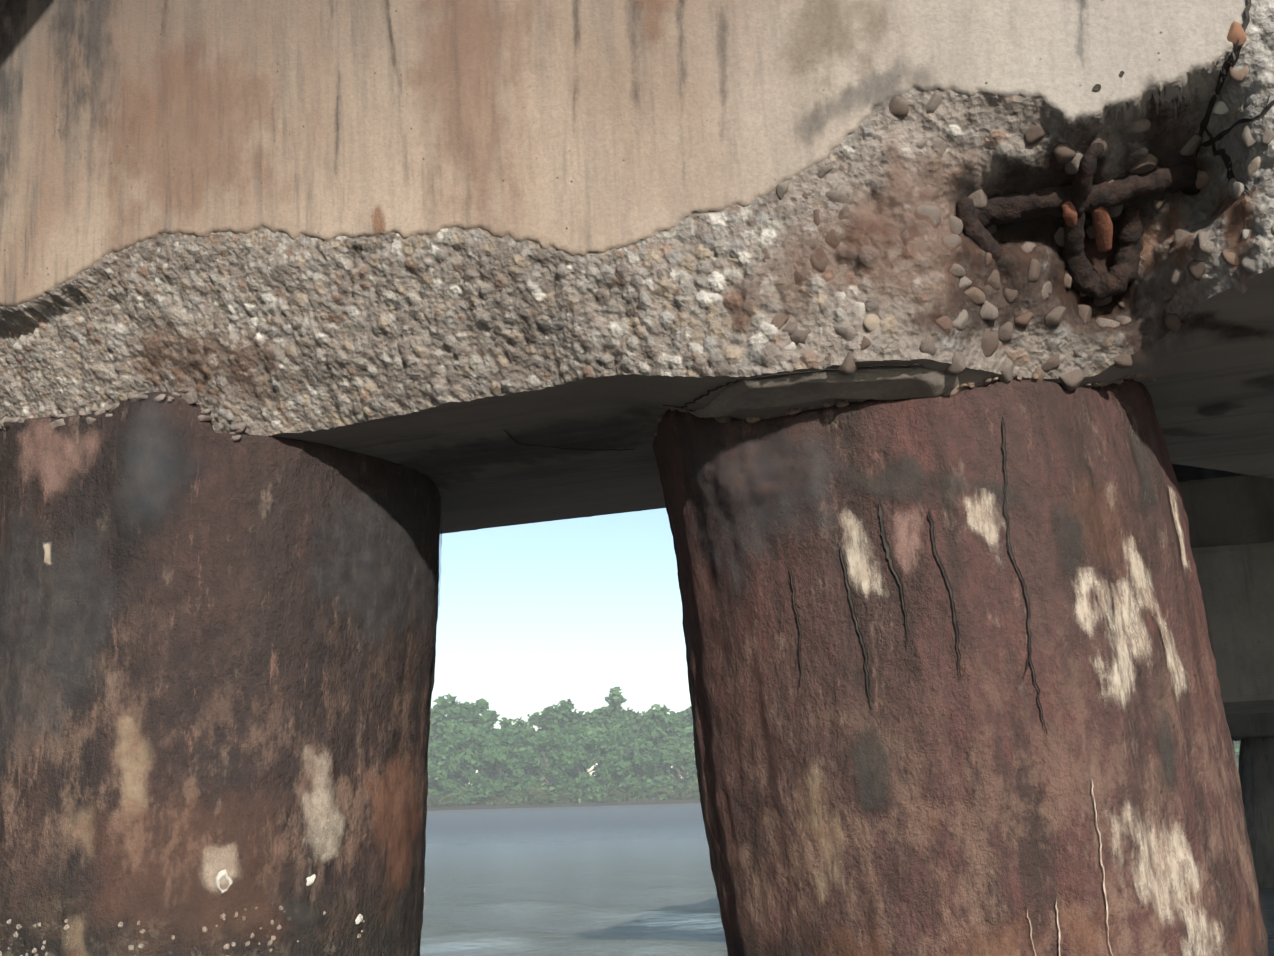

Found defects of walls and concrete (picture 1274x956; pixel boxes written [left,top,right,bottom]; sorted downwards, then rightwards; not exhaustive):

spalling [0,0,1274,436]
rust [958,150,1075,199]
rust [918,190,1266,350]
rust [1077,84,1208,185]
crack [1197,0,1274,233]
crack [840,546,872,709]
water stain [842,515,881,594]
crack [928,508,961,680]
crack [1002,417,1047,734]
water stain [1056,508,1183,701]
water stain [1169,491,1187,565]
water stain [1140,829,1198,915]